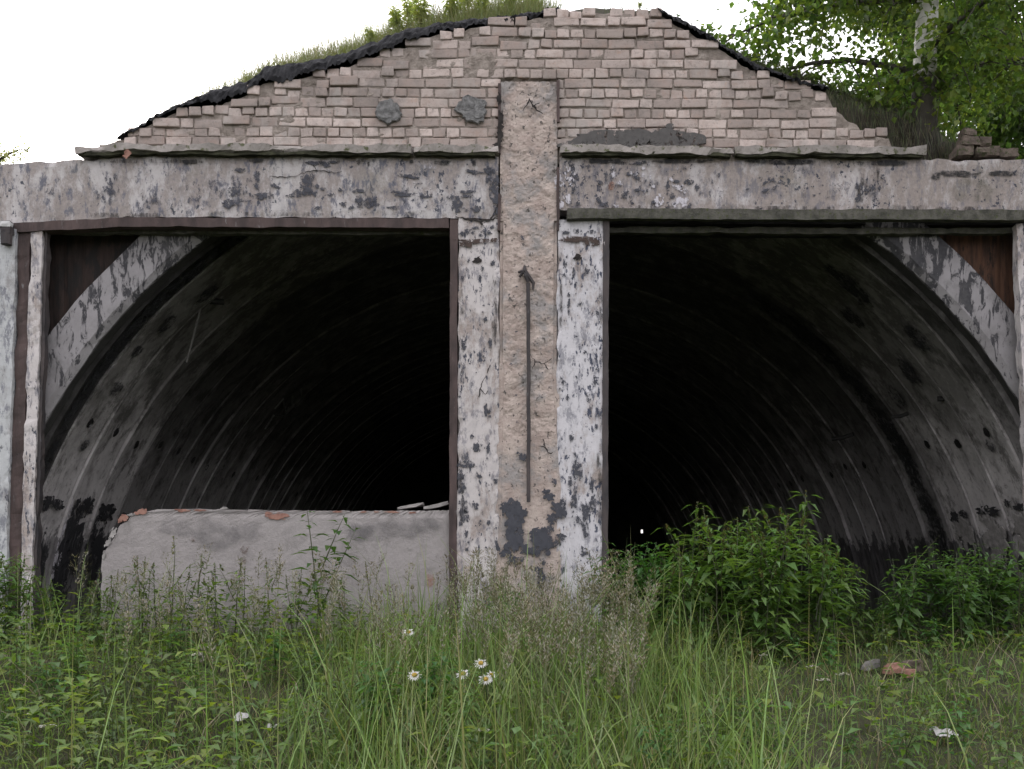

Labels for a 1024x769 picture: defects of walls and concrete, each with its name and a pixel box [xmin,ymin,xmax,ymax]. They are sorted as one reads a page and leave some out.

peeling [222,161,433,210]
peeling [554,160,699,209]
peeling [855,174,885,209]
peeling [559,229,600,315]